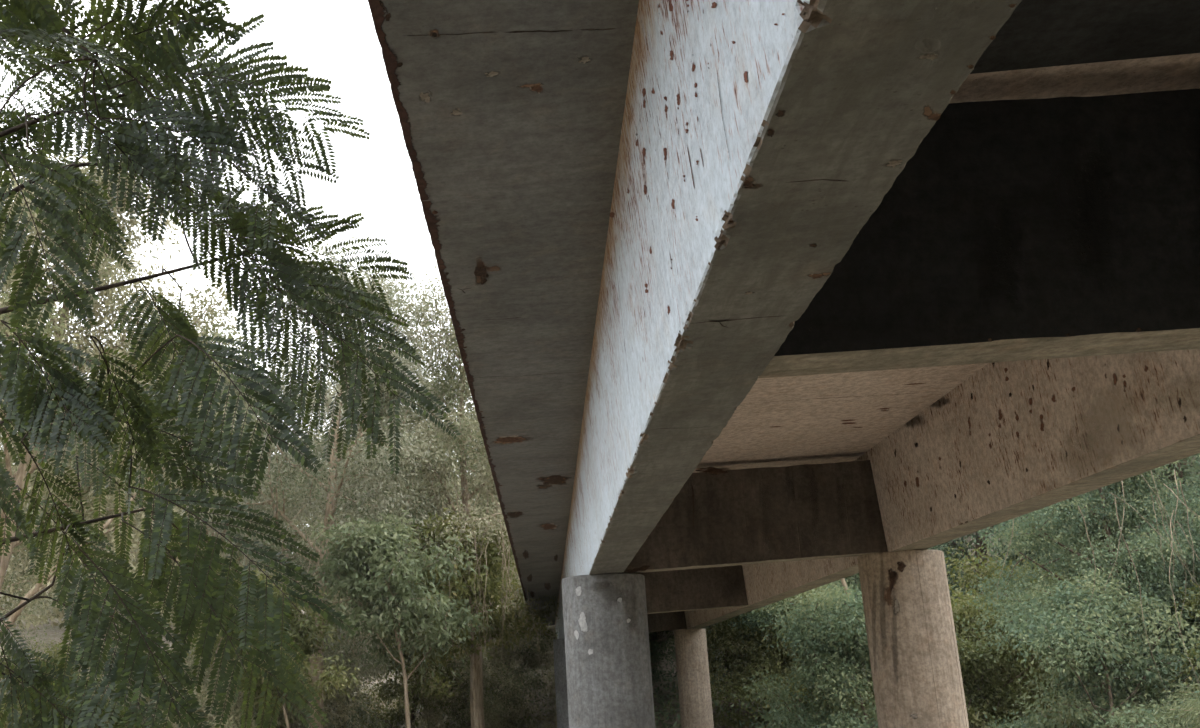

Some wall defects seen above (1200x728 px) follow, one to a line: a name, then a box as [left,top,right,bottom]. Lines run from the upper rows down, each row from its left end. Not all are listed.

crack [375,0,615,36]
corrosion [617,74,704,202]
spalling [474,259,500,285]
corrosion [368,0,527,601]
corrosion [988,398,1044,449]
spalling [537,475,570,489]